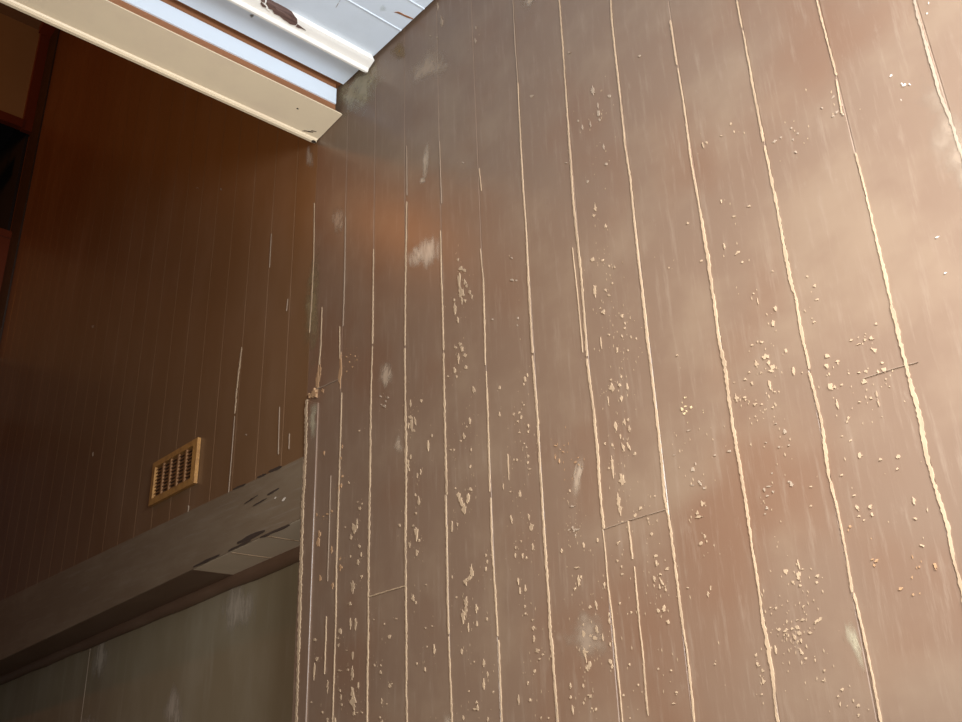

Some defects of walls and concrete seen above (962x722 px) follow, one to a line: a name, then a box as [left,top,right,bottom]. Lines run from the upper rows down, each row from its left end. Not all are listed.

peeling [445,252,473,322]
peeling [310,499,364,606]
peeling [321,618,363,722]
peeling [398,454,424,558]
peeling [443,387,476,532]
peeling [451,549,491,632]
peeling [510,569,551,685]
peeling [728,341,803,515]
peeling [755,555,834,705]
peeling [818,333,893,424]